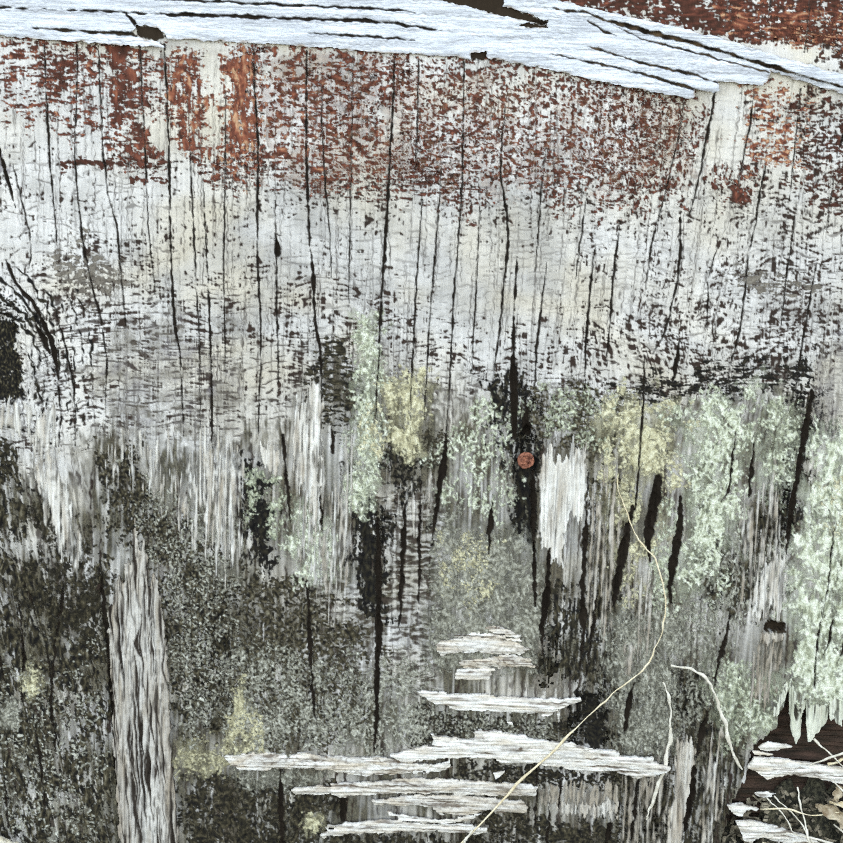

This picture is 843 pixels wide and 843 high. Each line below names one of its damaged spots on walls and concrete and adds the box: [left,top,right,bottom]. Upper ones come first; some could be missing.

spalling [136,25,166,41]
spalling [442,0,548,28]
crack [0,0,436,454]
leakage [0,424,451,843]
crack [281,434,291,520]
crack [373,61,480,752]
peeling [435,625,535,680]
leakage [176,329,840,843]
crack [494,109,547,440]
peeling [222,690,820,843]
crack [553,7,843,688]
peeling [747,741,843,784]